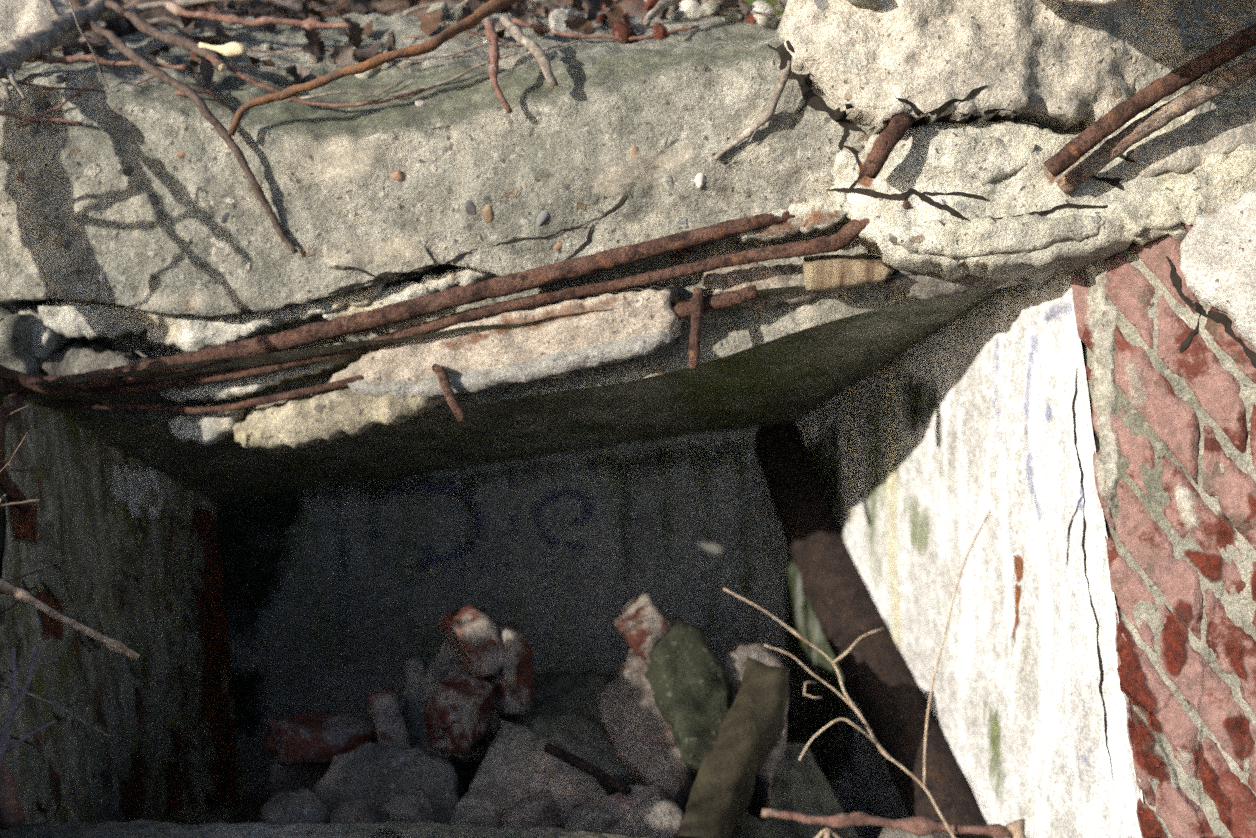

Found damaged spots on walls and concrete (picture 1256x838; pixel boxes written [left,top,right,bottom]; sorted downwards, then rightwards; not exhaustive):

spalling [861,112,913,179]
crack [767,40,1135,221]
spalling [881,24,1256,258]
crack [327,138,677,294]
rust [758,210,839,241]
rust [470,298,614,343]
spalling [882,271,1032,301]
spalling [0,193,870,545]
water stain [111,465,165,519]
water stain [884,364,901,650]
peeling [37,591,64,640]
rust [1012,556,1023,641]